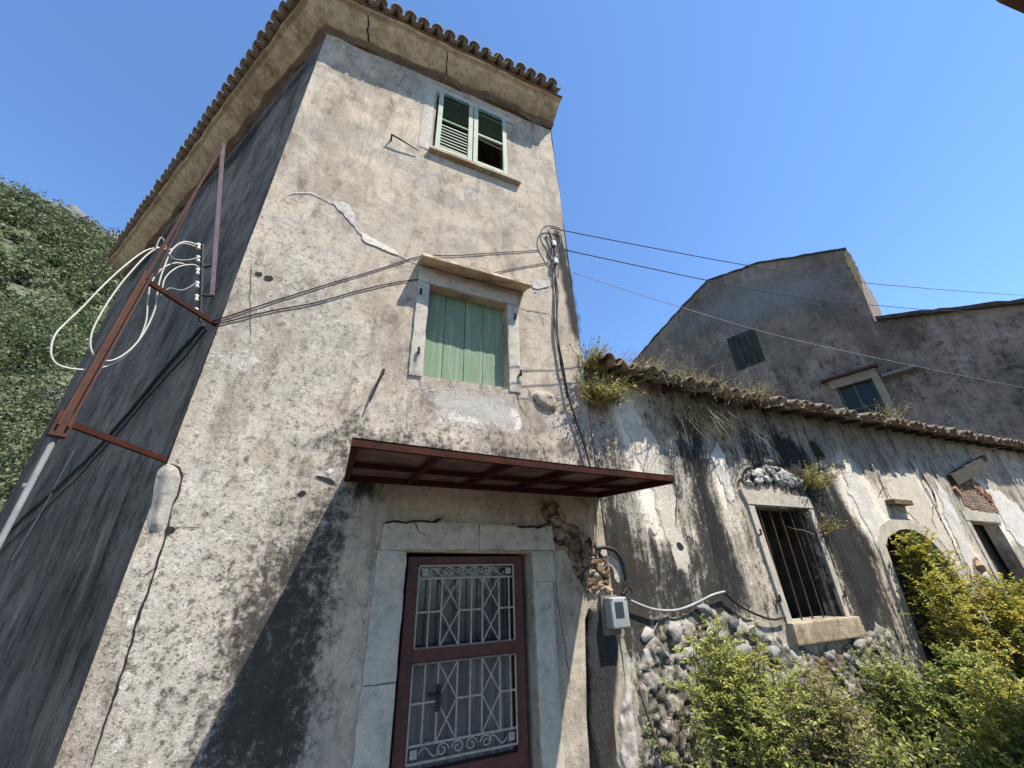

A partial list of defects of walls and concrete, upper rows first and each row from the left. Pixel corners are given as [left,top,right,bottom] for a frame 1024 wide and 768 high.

crack [384,517,445,536]
flaking render [540,501,621,598]
water stain [648,530,661,582]
water stain [670,544,691,600]
water stain [684,418,749,602]
flaking render [711,442,805,503]
water stain [775,436,880,632]
flaking render [884,473,1024,616]
crack [91,502,202,768]